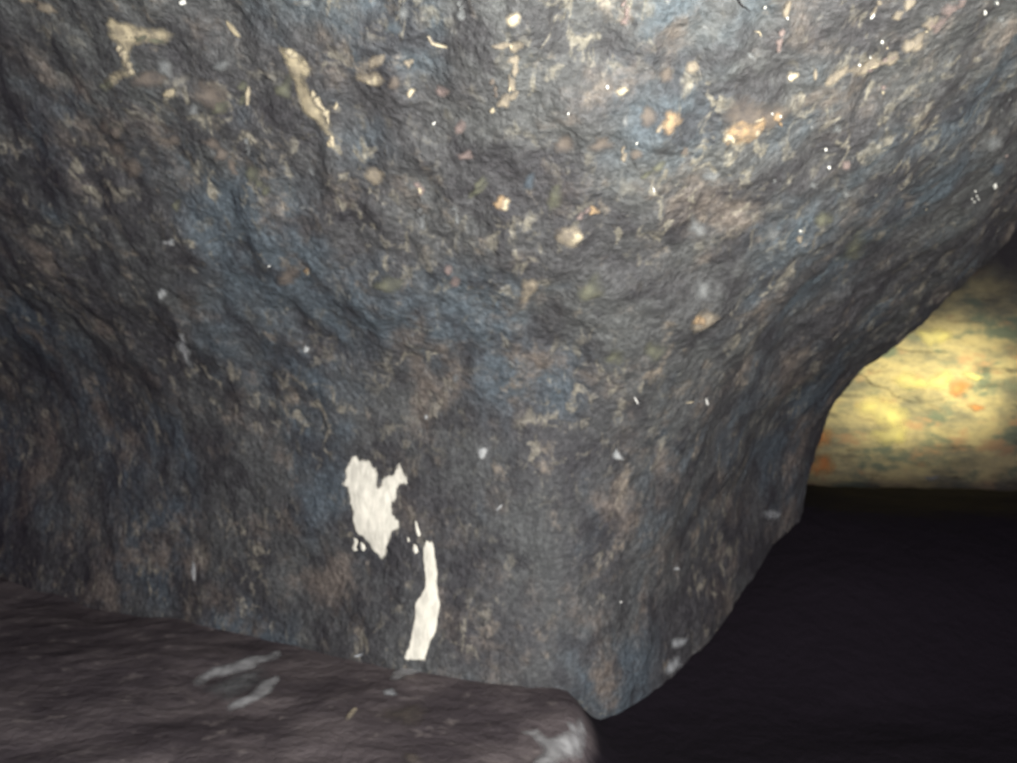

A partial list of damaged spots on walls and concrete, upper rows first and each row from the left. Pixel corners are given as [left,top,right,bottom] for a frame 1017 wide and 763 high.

peeling [344,456,407,559]
peeling [404,521,440,660]